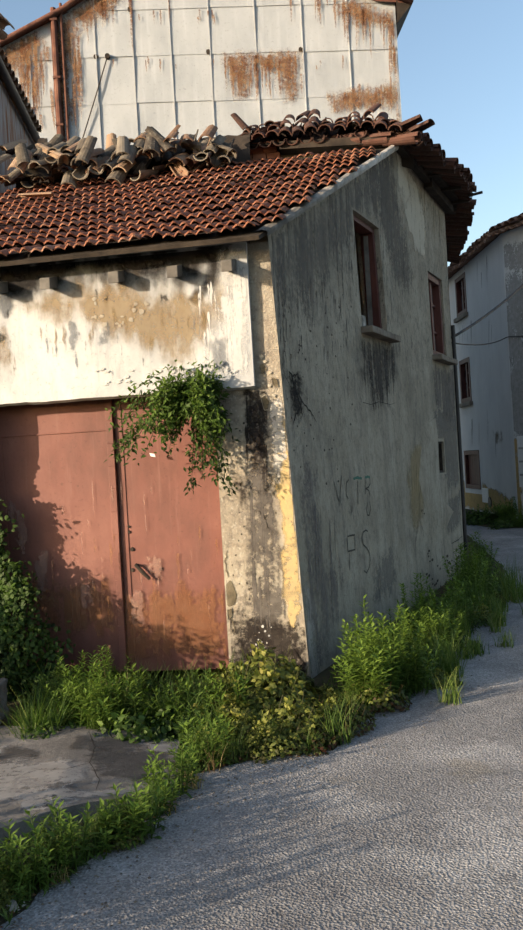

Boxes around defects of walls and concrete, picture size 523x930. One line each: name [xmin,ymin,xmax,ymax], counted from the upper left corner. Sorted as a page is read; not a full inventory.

corrosion [5,0,117,136]
corrosion [213,51,303,100]
corrosion [315,0,400,120]
damp [272,154,446,344]
damp [283,373,303,416]
damp [361,341,395,408]
damp [230,389,339,673]
peeling [259,355,319,678]
spalling [224,550,260,640]